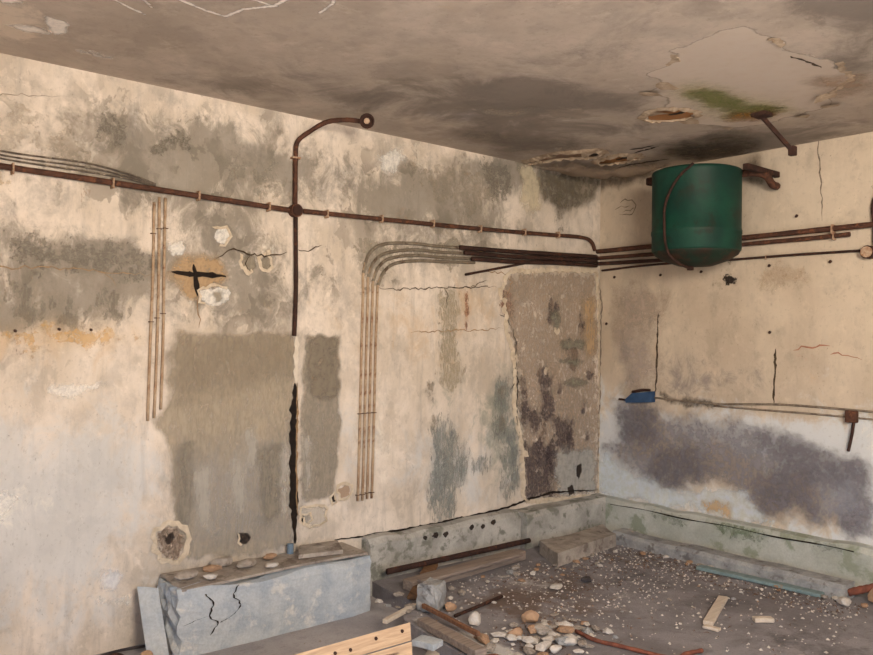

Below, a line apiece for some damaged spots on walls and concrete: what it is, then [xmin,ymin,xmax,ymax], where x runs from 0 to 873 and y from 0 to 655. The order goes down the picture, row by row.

peeling [637,26,856,130]
spalling [520,148,645,167]
damp [674,134,757,165]
damp [10,230,157,281]
crack [380,271,520,438]
flaking render [498,266,600,504]
crack [772,344,862,402]
damp [598,404,868,533]
spalling [150,520,368,592]
crack [335,490,593,540]
crack [610,504,854,552]
crack [187,585,241,634]